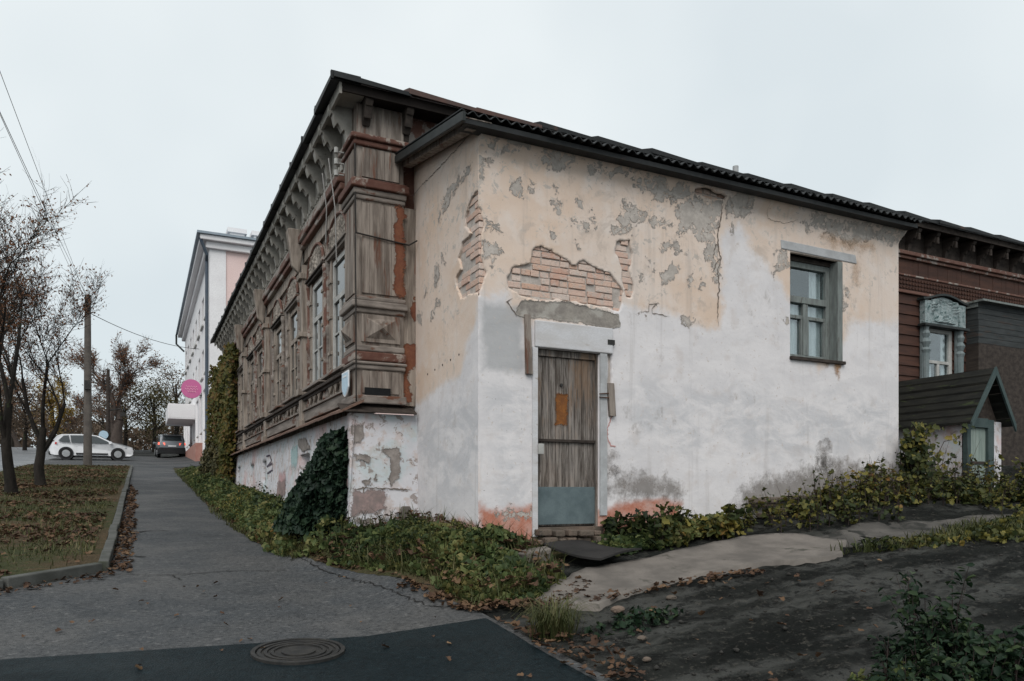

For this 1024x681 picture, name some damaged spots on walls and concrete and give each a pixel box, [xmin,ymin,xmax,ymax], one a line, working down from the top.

peeling [392,204,446,326]
spalling [438,137,755,328]
crack [713,206,723,323]
flaking render [351,424,401,524]
leakage [607,455,680,497]
leakage [740,441,895,519]